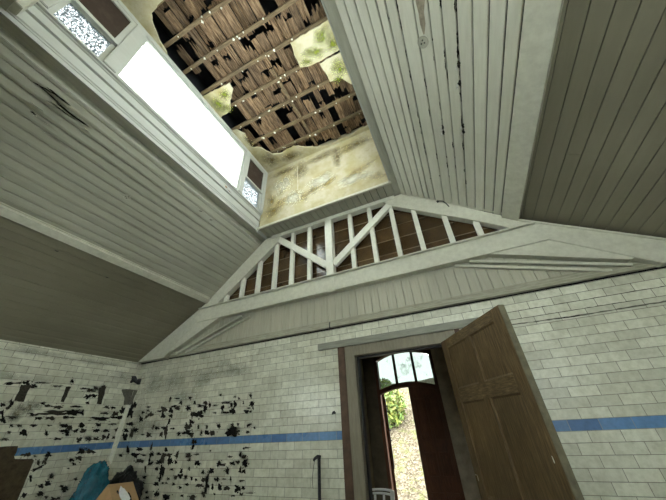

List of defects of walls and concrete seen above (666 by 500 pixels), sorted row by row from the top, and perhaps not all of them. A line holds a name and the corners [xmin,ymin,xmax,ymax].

leakage [303,31,337,64]
leakage [269,175,332,215]
flaking render [0,377,255,500]